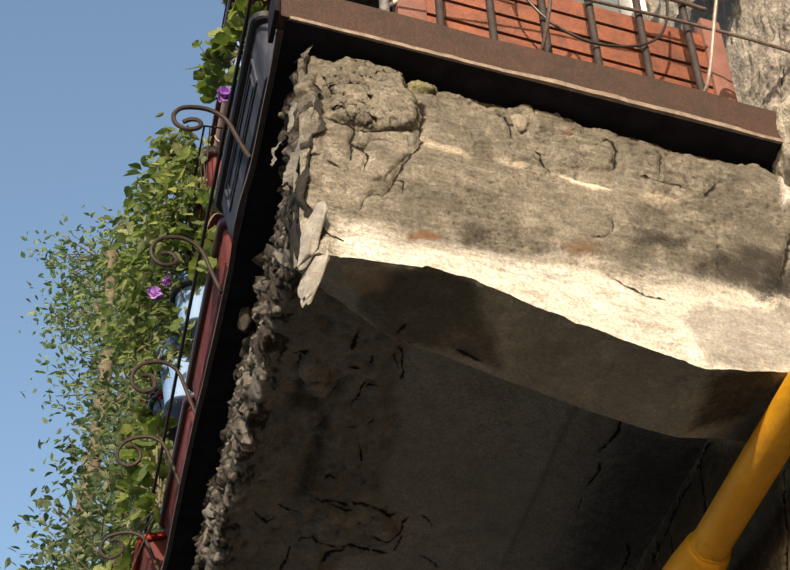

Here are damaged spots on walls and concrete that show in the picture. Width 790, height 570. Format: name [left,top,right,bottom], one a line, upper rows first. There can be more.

crack [306,118,383,169]
crack [359,84,426,210]
crack [601,138,618,171]
crack [639,154,691,190]
spalling [191,44,344,570]
crack [612,278,667,301]
leakage [694,249,790,299]
crack [393,324,410,379]
crack [349,355,377,407]
crack [578,421,621,509]
crack [254,446,432,570]